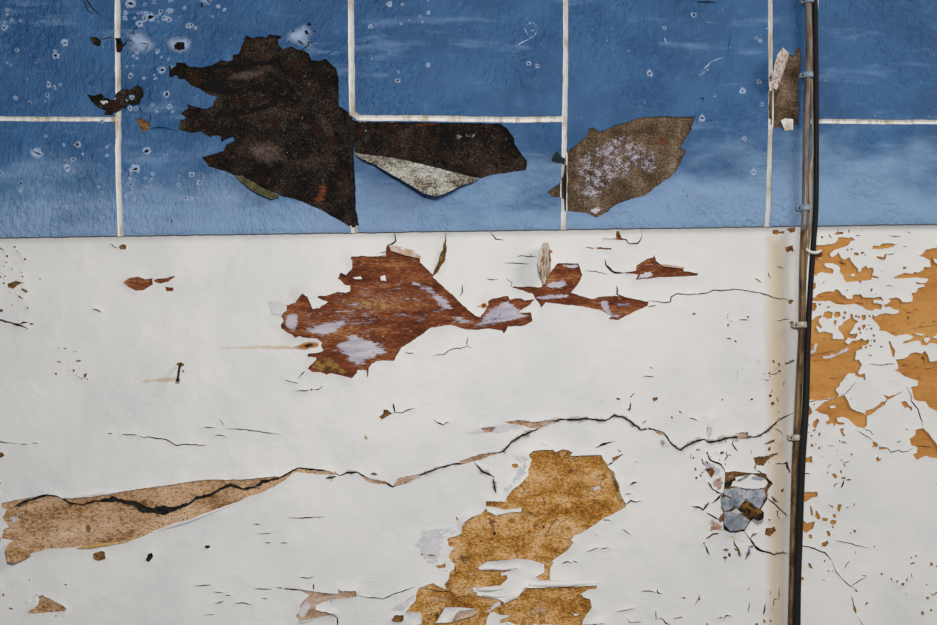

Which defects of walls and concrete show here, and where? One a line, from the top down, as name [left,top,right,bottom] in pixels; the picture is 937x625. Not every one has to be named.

peeling [87,23,527,227]
peeling [548,116,695,218]
peeling [768,48,800,131]
crack [0,319,34,329]
peeling [268,243,648,378]
peeling [805,230,937,474]
crack [379,403,414,419]
crack [858,429,908,453]
peeling [0,467,337,563]
peeling [391,449,627,625]
crack [326,413,867,625]
crack [197,577,312,615]